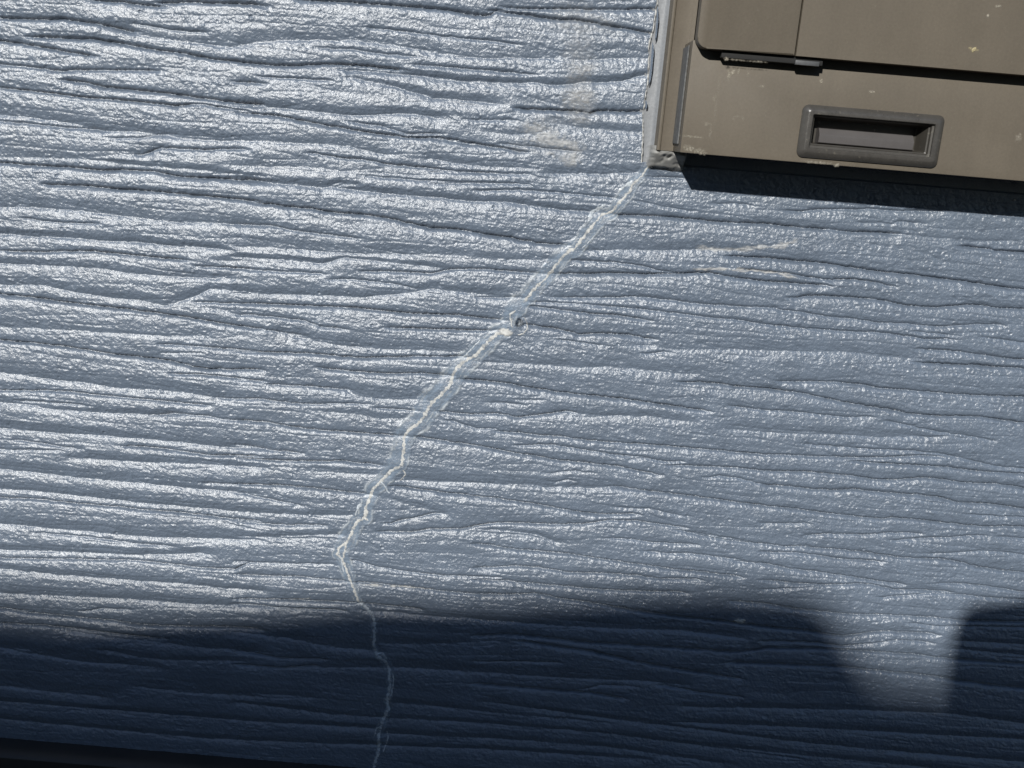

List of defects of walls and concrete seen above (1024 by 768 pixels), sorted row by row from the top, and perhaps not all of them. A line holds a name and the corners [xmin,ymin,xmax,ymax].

crack [332,166,651,768]